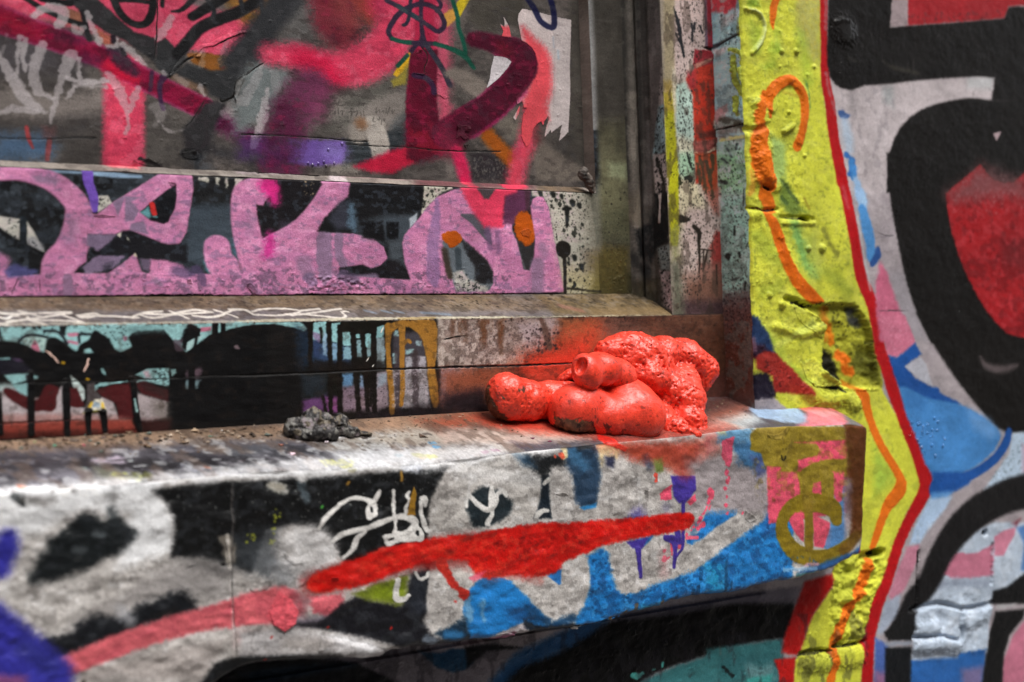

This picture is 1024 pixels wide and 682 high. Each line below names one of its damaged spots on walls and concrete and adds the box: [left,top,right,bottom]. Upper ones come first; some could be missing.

crack [186,63,264,126]